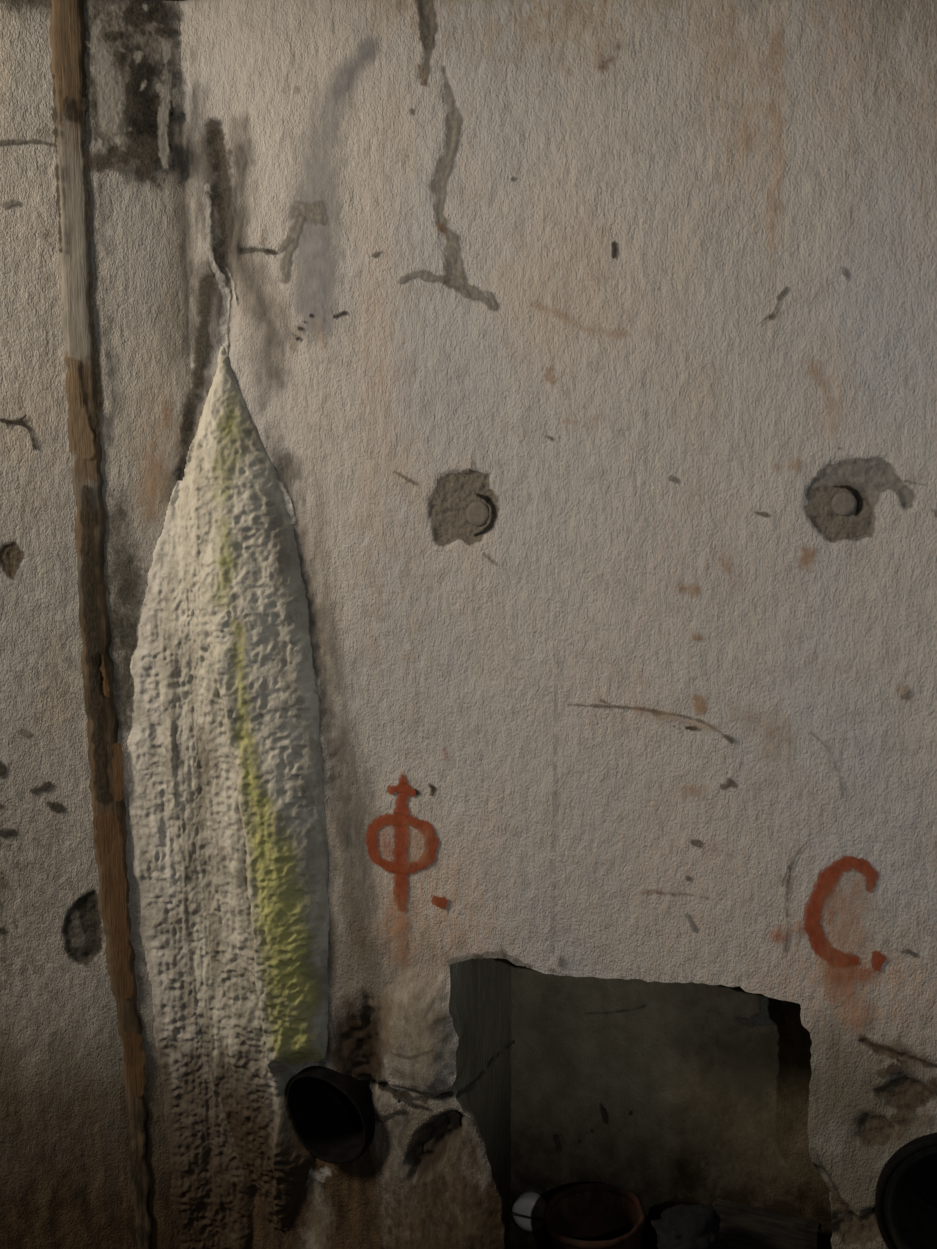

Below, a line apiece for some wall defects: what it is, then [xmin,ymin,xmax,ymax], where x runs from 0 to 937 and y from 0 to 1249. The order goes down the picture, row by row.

crack [415,0,436,85]
leakage [232,142,337,384]
spalling [429,461,498,564]
spalling [805,448,914,542]
leakage [106,494,140,729]
leakage [292,505,335,665]
spalling [447,948,530,968]
crack [365,1040,515,1122]
leakage [306,1169,330,1249]